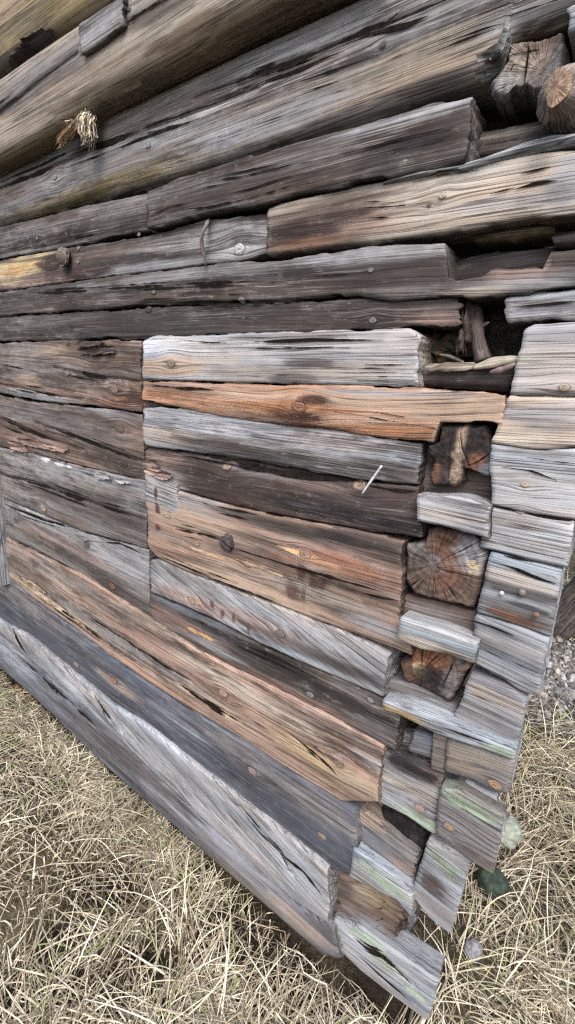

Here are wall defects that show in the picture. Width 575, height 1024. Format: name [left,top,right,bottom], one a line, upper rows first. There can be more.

peeling [8,438,68,454]
crack [35,591,238,721]
crack [286,730,337,775]
crack [239,806,322,896]